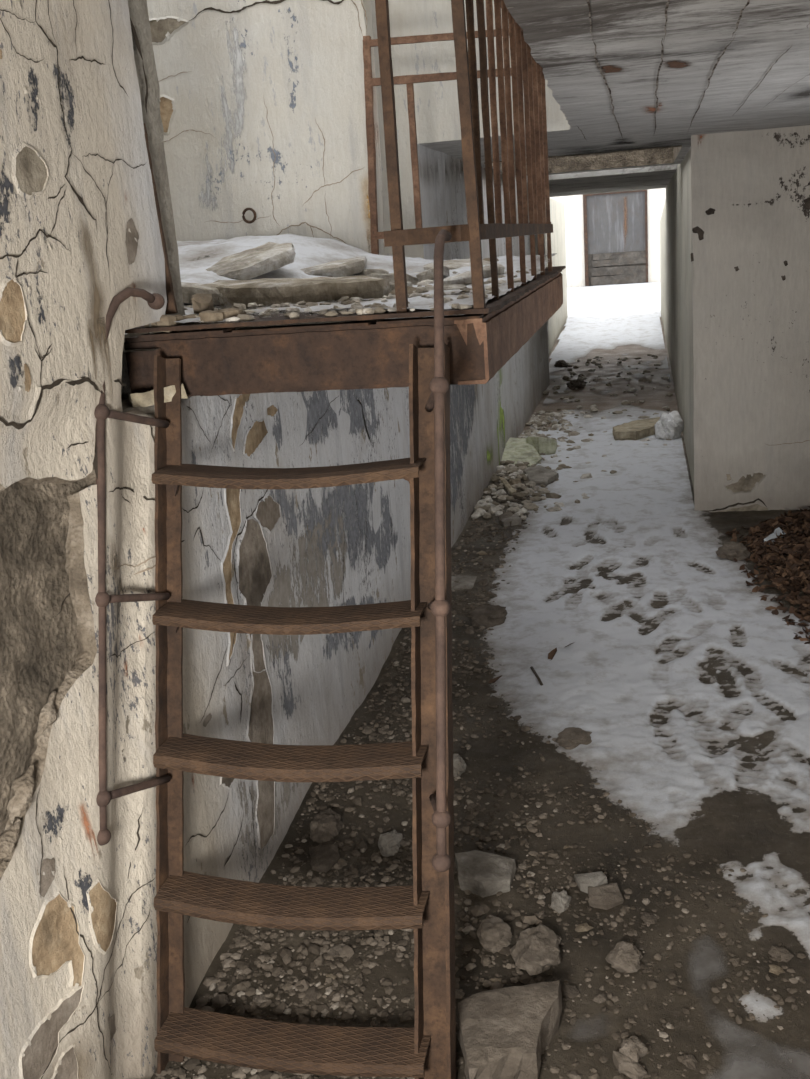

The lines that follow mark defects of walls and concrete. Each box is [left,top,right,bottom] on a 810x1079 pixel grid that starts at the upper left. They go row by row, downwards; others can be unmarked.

crack [189,0,285,21]
crack [322,0,367,36]
corrosion [601,65,622,73]
corrosion [666,61,690,69]
flaking render [0,142,49,242]
crack [0,0,191,292]
crack [0,316,126,430]
flaking render [205,394,282,461]
peeling [198,482,398,607]
flaking render [0,419,97,880]
flaking render [18,805,118,1079]
crack [36,784,155,1079]